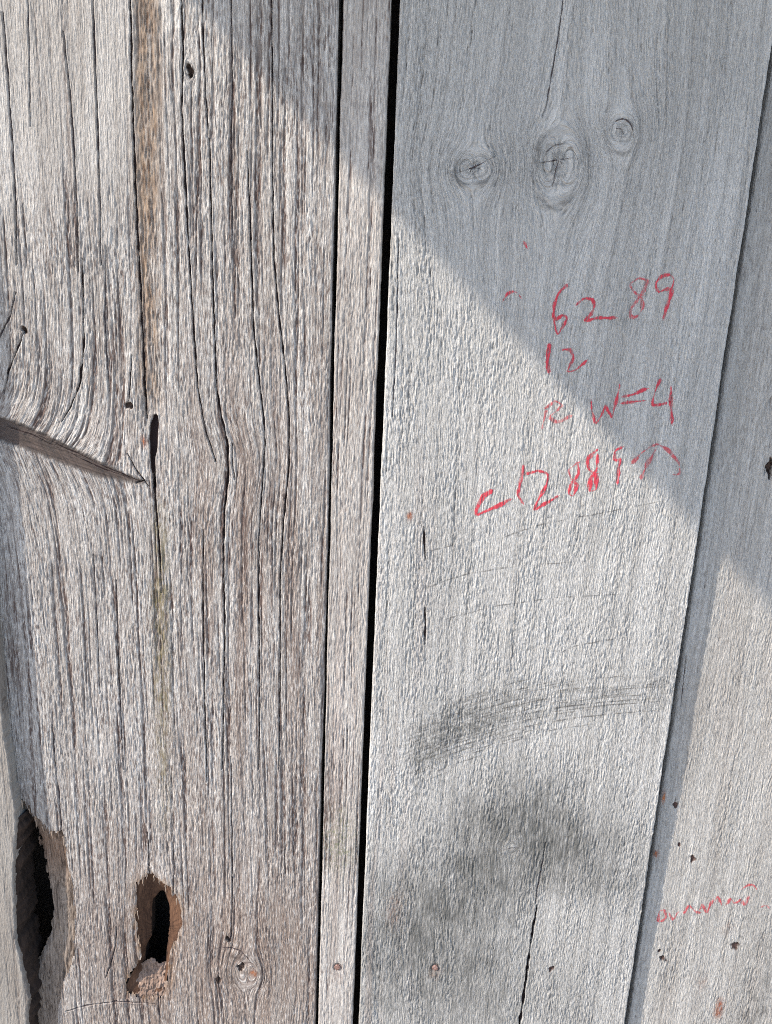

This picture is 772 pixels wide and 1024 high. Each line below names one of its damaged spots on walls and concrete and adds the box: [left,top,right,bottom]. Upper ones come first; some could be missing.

crack [542,1,563,116]
crack [64,0,162,582]
crack [519,849,545,1024]